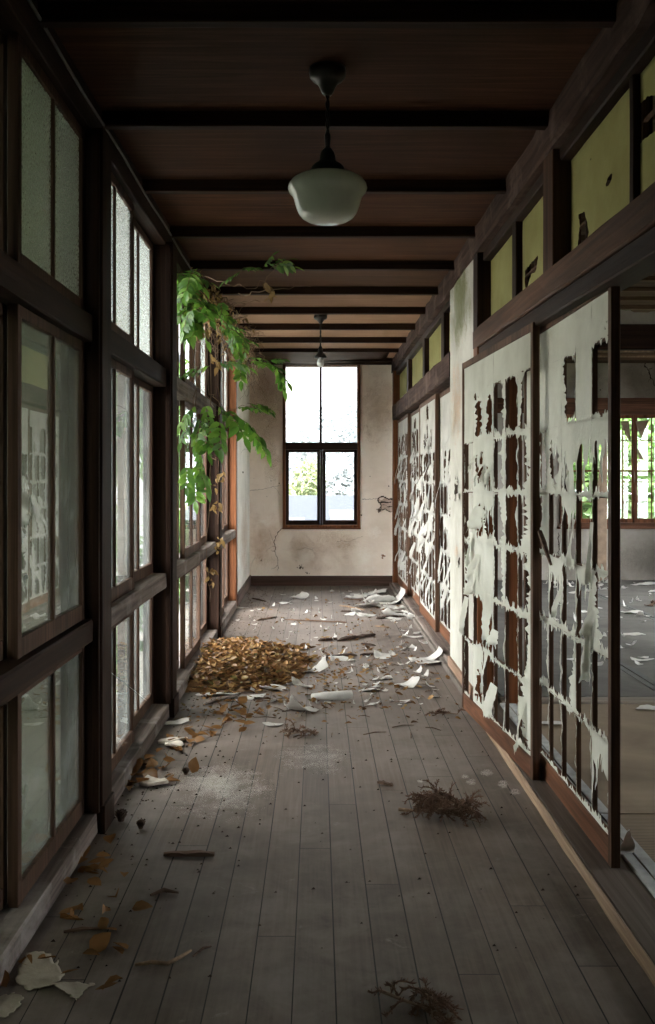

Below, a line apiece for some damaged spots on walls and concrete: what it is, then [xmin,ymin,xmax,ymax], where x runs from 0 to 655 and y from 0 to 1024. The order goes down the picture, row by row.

spalling [376,485,392,513]